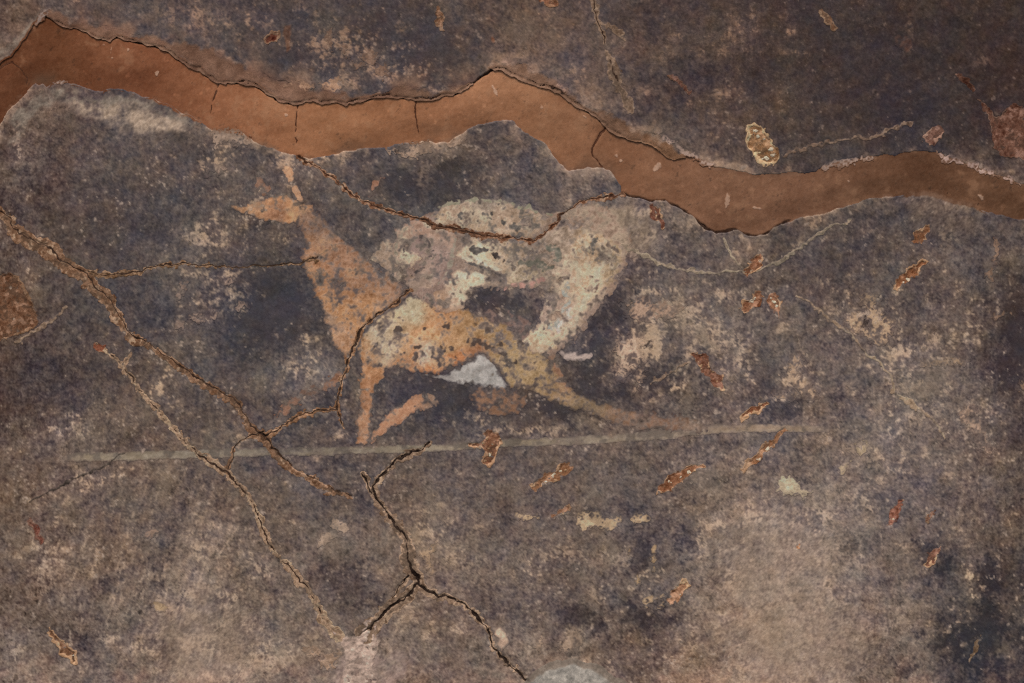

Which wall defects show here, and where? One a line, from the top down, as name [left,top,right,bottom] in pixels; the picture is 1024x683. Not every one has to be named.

spalling [434,6,446,31]
spalling [818,8,838,32]
peeling [283,75,344,92]
spalling [955,72,1024,160]
peeling [210,125,253,150]
peeling [384,139,433,161]
peeling [656,130,715,168]
spalling [745,122,780,167]
peeling [821,154,877,171]
peeling [922,125,1022,186]
spalling [649,203,665,230]
crack [0,206,527,682]